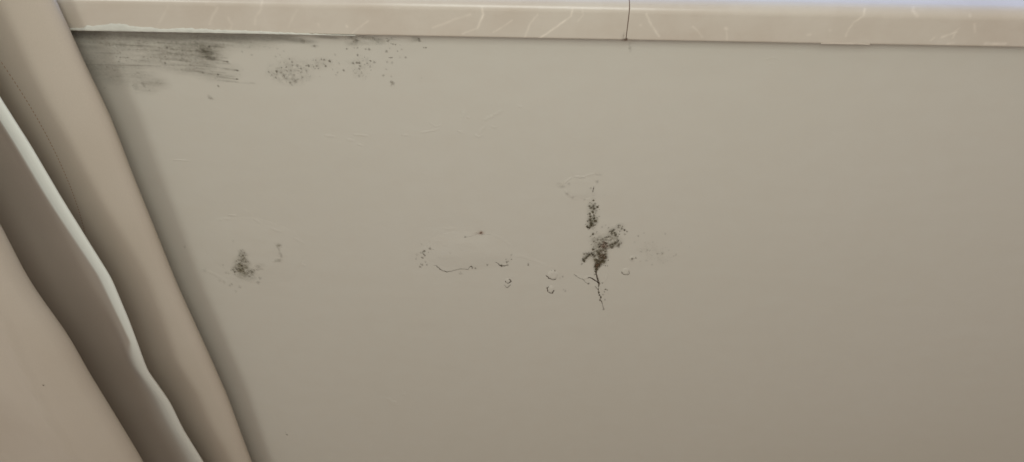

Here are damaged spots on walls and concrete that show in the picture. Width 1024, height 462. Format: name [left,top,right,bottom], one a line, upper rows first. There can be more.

water stain [72,32,248,57]